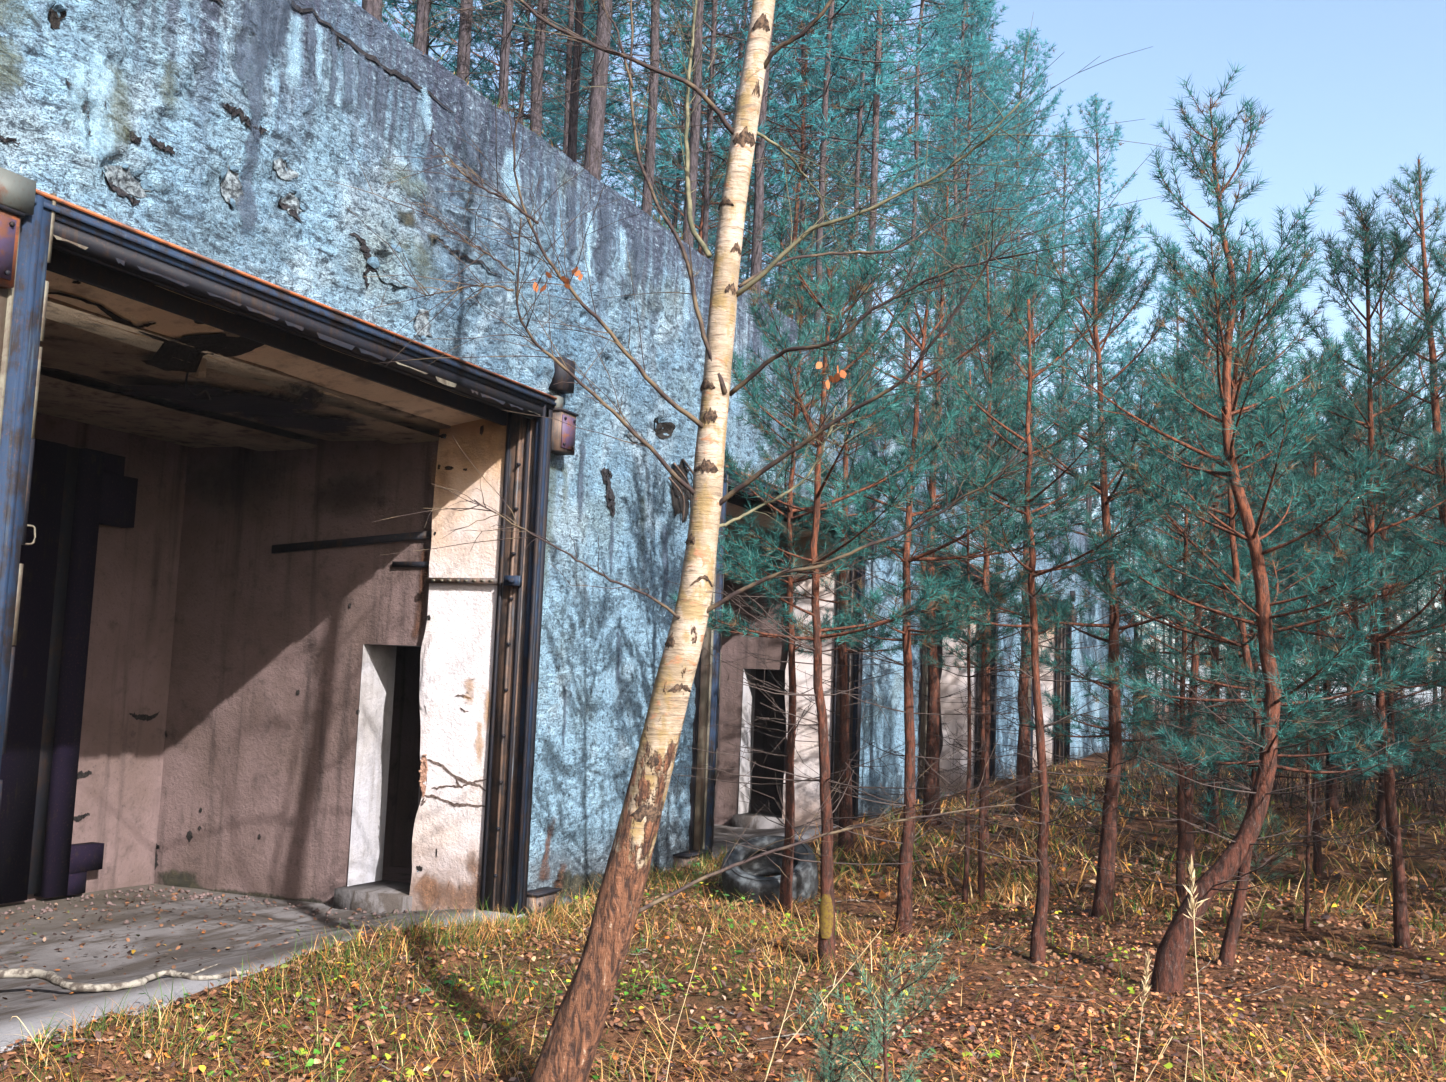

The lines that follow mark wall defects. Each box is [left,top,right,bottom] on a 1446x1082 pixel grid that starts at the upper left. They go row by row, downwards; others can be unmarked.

leakage [308,16,383,121]
leakage [234,0,289,232]
leakage [398,210,438,246]
leakage [549,171,578,262]
leakage [598,206,611,283]
crack [421,759,486,807]